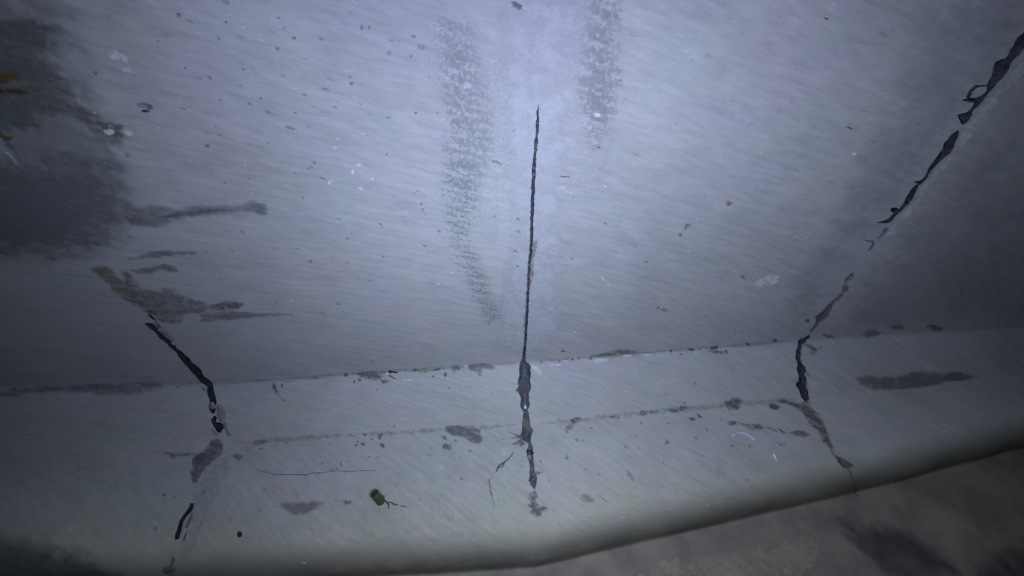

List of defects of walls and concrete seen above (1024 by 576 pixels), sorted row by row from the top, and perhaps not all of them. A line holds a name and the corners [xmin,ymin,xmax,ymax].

crack [145,314,494,576]
damp [500,0,580,353]
crack [491,33,1024,516]